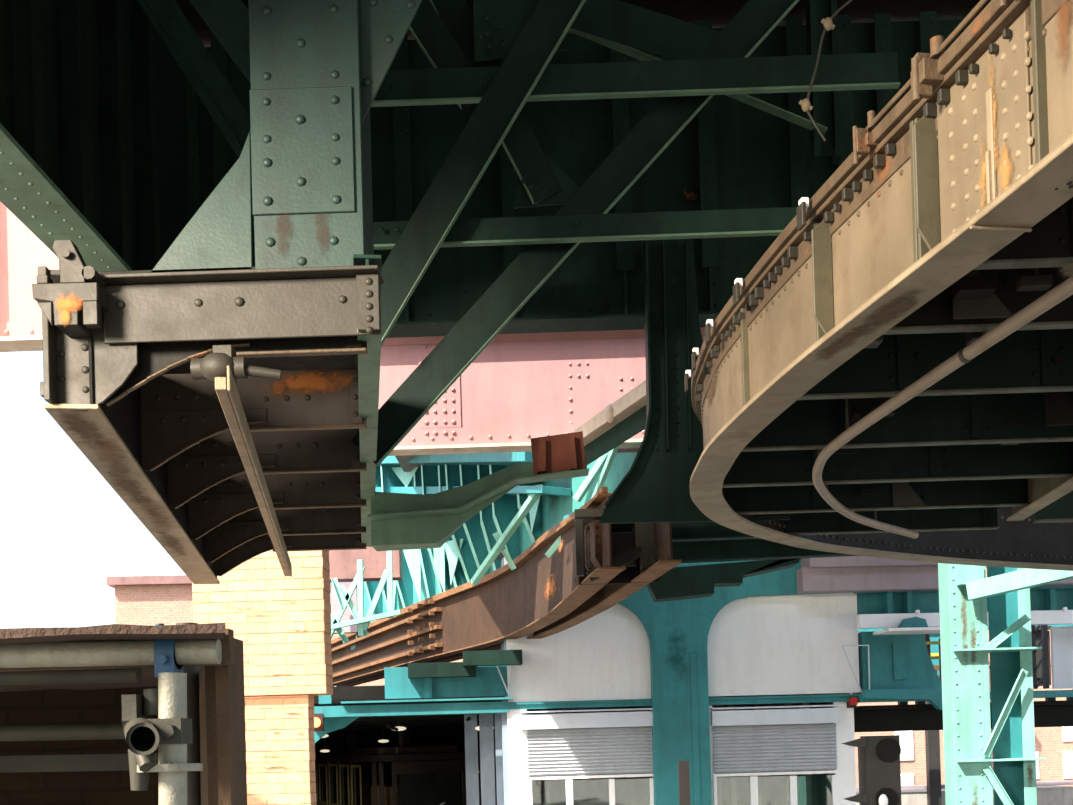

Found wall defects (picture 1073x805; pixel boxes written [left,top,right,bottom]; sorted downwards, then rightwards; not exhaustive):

corrosion [979,78,1012,206]
corrosion [56,296,81,323]
corrosion [273,372,351,395]
corrosion [962,603,976,661]